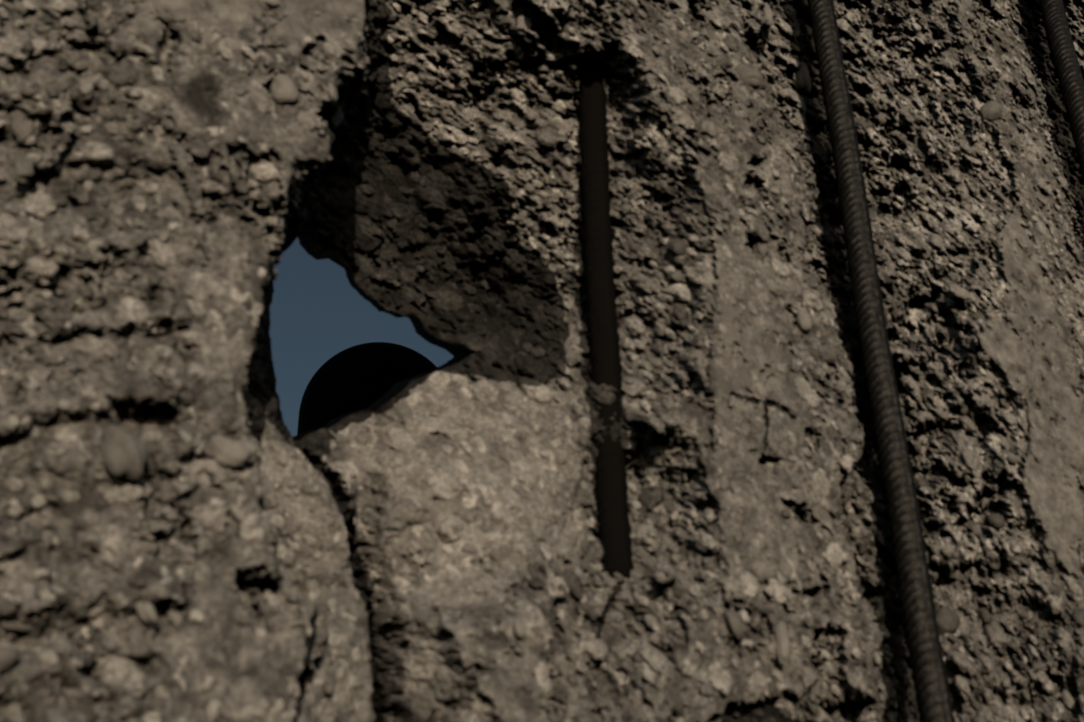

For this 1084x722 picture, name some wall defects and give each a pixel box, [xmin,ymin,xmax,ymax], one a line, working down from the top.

spalling [0,0,634,722]
spalling [591,0,1084,722]